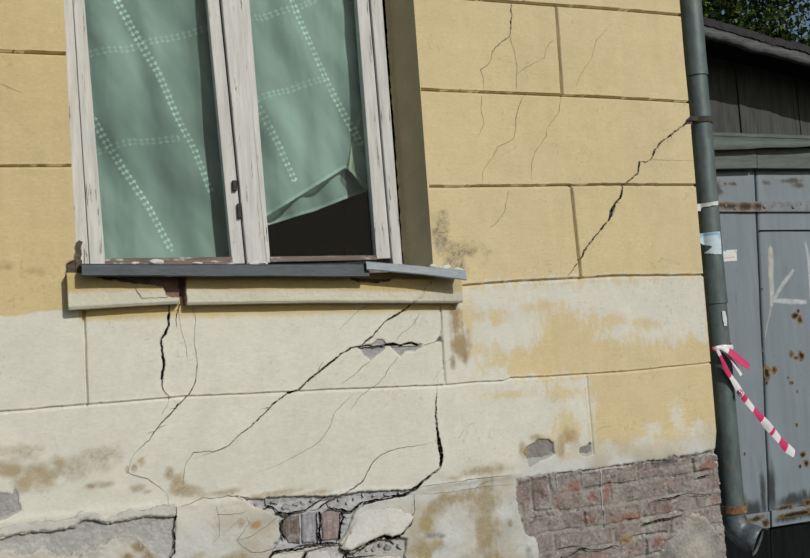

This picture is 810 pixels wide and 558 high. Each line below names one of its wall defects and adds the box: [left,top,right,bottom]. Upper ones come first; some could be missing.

crack [479,4,554,180]
crack [570,116,694,273]
flaking render [360,340,420,357]
water stain [452,306,466,358]
water stain [0,465,49,490]
flaking render [0,490,176,558]
crack [127,282,509,558]
flaking render [247,489,414,558]
flaking render [523,439,553,459]
flaking render [515,449,727,558]